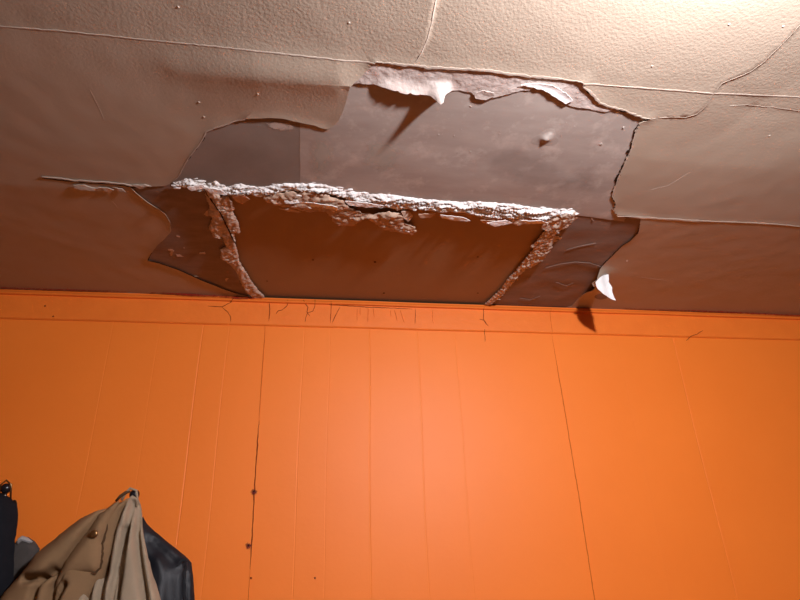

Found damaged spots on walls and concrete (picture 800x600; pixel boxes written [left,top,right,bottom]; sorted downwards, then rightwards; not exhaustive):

peeling [132,62,650,308]
crack [583,83,800,98]
crack [248,300,433,600]